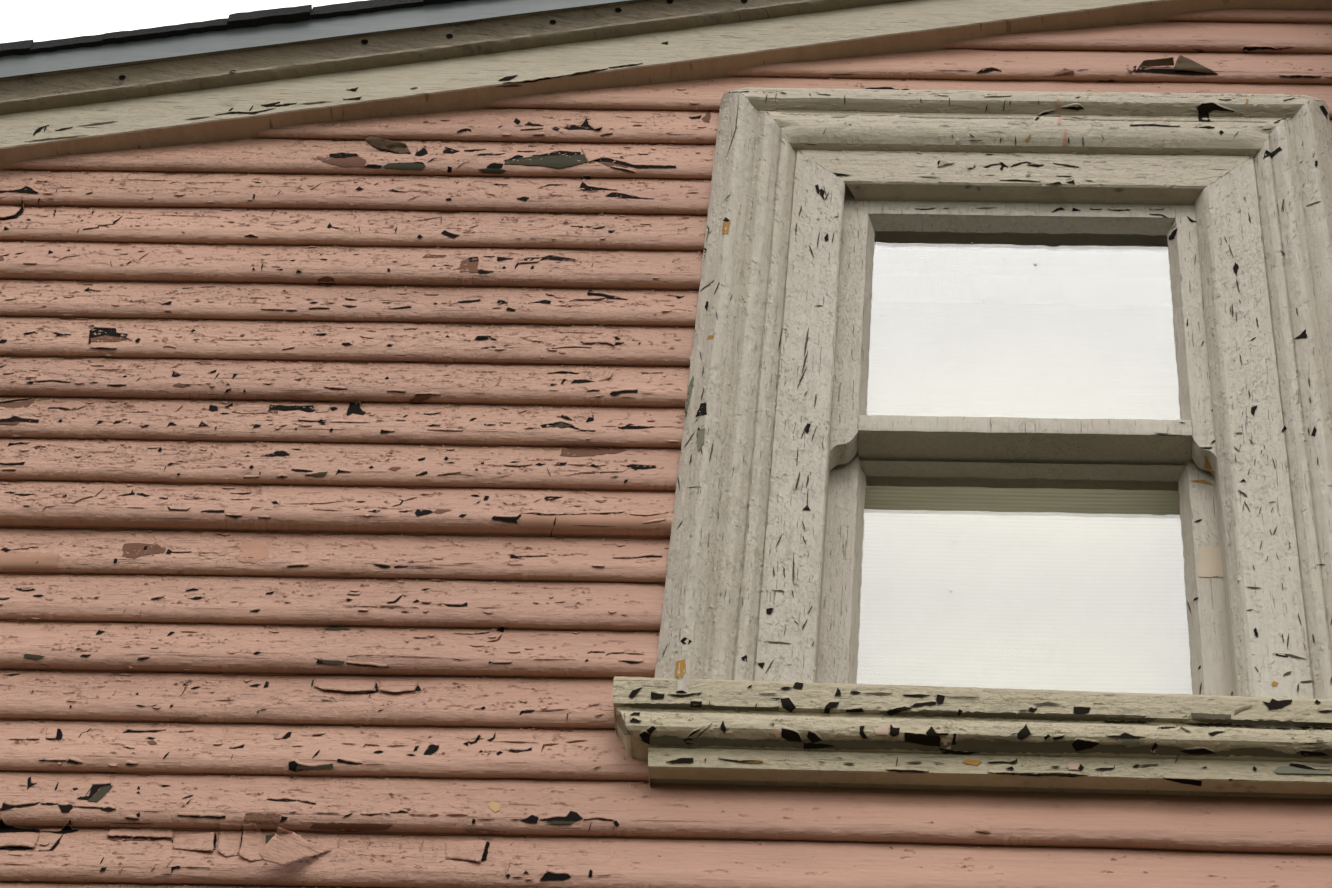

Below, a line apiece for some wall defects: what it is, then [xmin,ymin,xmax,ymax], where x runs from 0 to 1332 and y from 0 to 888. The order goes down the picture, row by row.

peeling [1127,55,1217,75]
peeling [478,116,675,199]
peeling [938,159,976,169]
peeling [62,304,140,366]
peeling [113,530,192,563]
peeling [314,657,421,694]
peeling [629,685,702,701]
peeling [824,687,864,711]
peeling [615,711,656,735]
peeling [1274,749,1332,774]
peeling [0,727,409,865]
peeling [520,808,583,821]